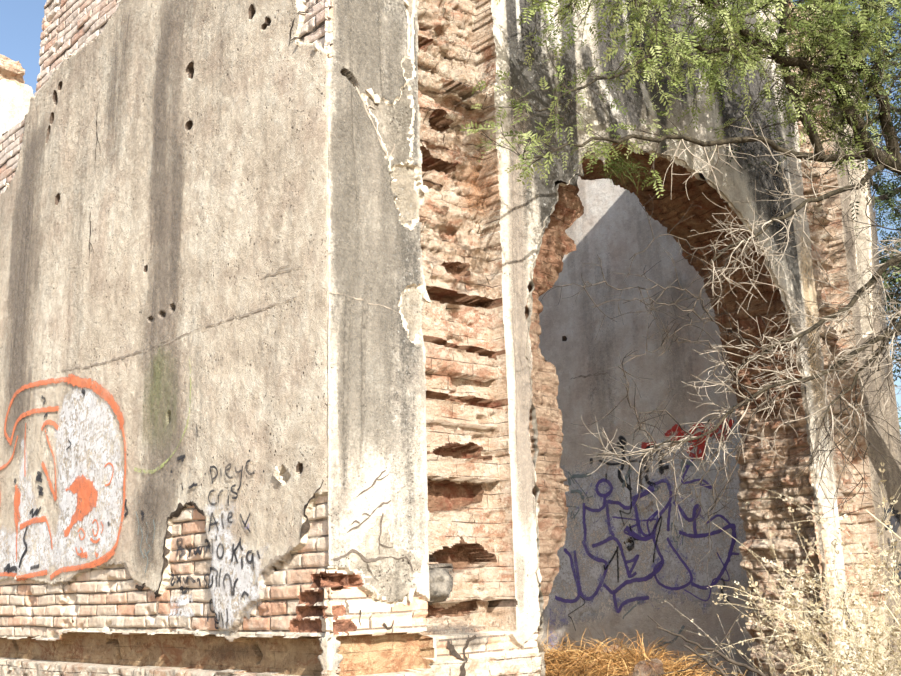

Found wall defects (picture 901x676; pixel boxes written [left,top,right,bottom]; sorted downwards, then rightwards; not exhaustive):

damp [7,125,45,454]
damp [136,0,182,563]
spalling [0,0,539,676]
damp [333,0,401,459]
spalling [529,184,584,609]